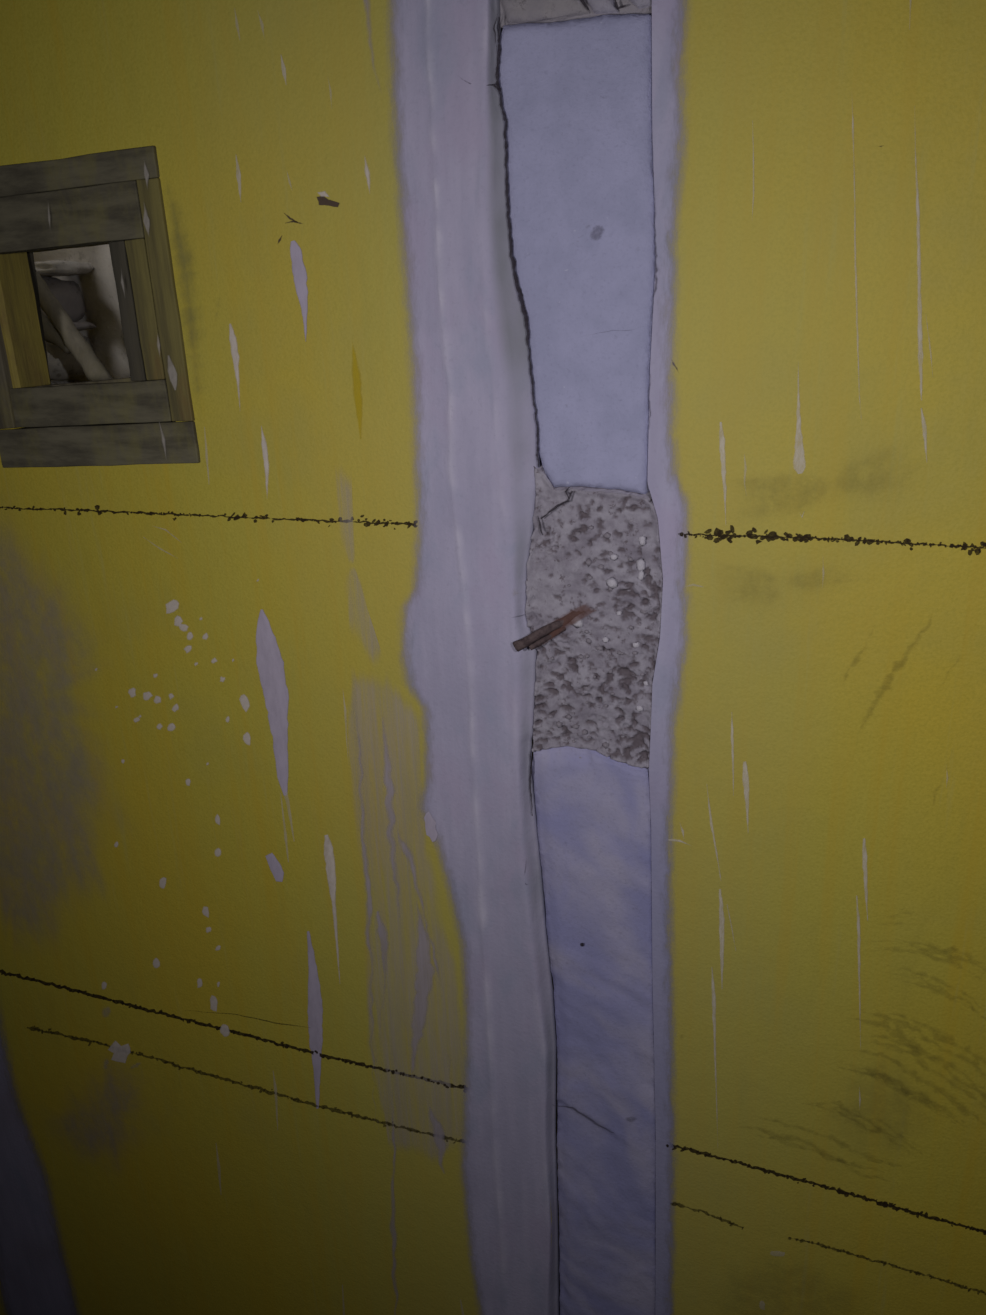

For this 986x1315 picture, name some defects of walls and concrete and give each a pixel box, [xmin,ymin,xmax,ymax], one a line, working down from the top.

crack [490,17,539,467]
crack [538,487,573,535]
spalling [525,462,663,769]